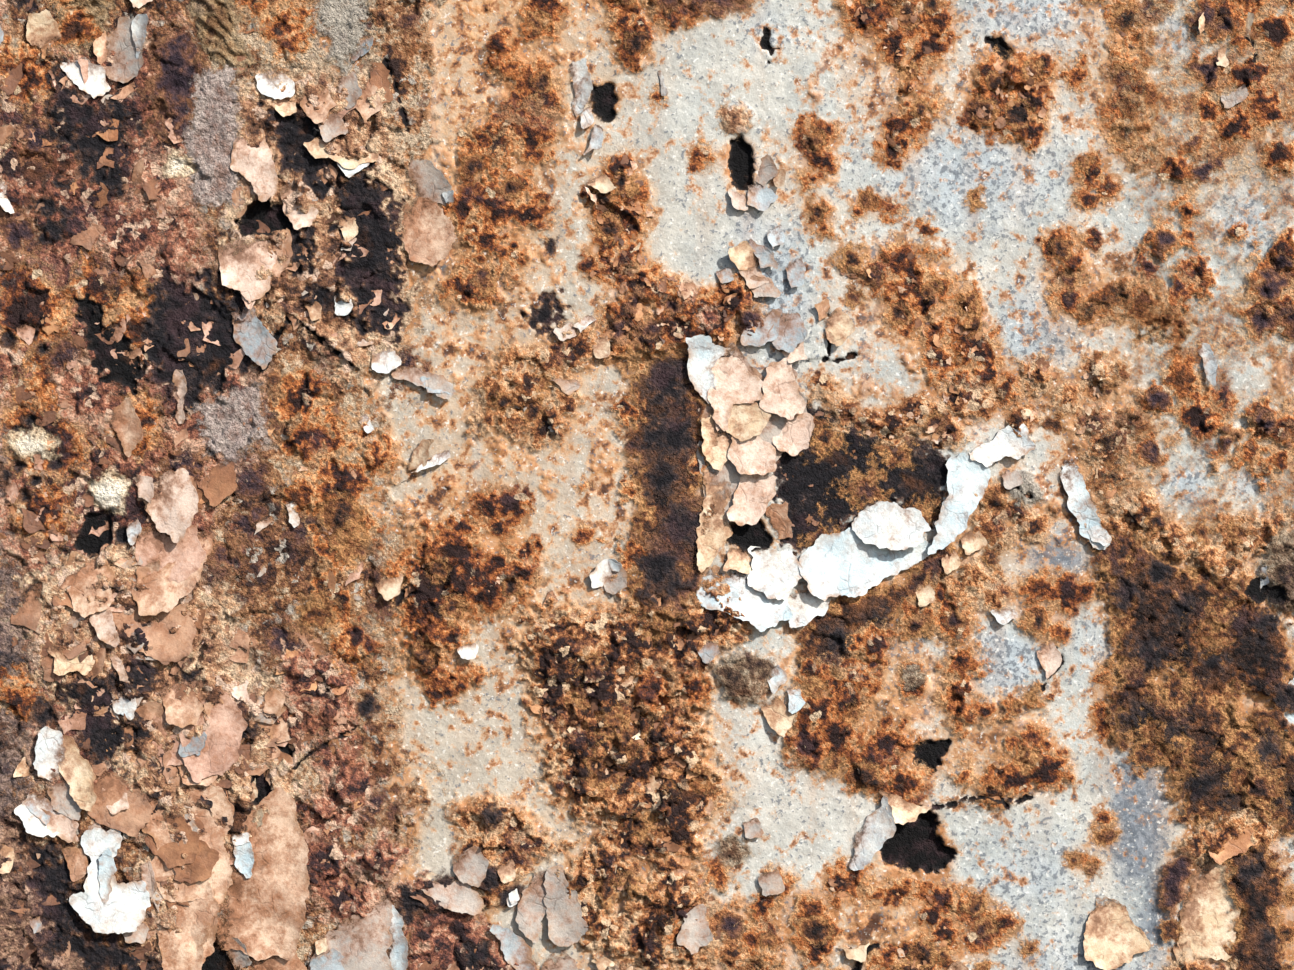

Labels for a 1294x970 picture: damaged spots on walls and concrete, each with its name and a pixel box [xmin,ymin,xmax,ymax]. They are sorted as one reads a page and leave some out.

peeling [570,58,618,155]
spalling [727,135,755,190]
spalling [70,37,456,457]
corrosion [0,0,1025,970]
peeling [512,257,1036,676]
corrosion [778,0,1294,970]
peeling [376,574,417,607]
peeling [0,455,408,970]
peeling [761,665,806,737]
spalling [849,790,957,874]
crack [932,794,1033,810]
peeling [421,846,633,970]